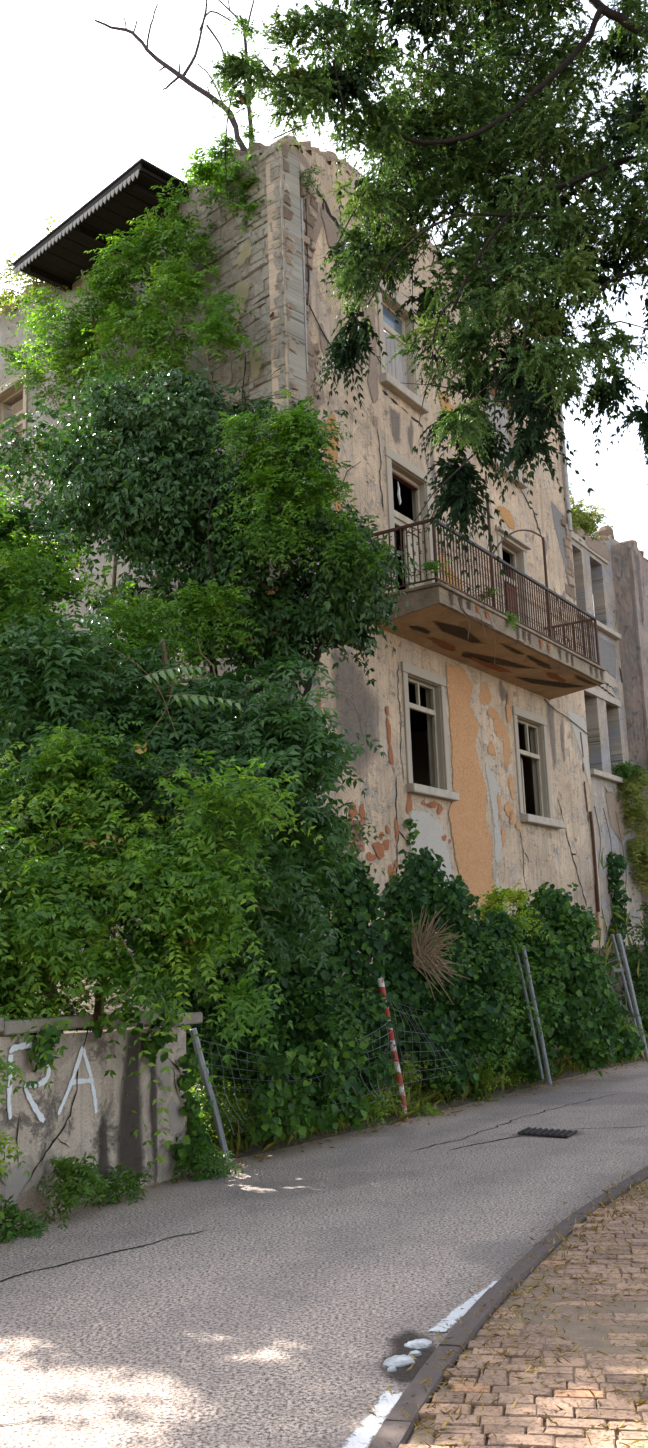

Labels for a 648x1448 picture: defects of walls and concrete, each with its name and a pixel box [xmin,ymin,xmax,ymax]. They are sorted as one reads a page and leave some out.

damp [410,622,603,699]
damp [548,705,565,765]
peeling [367,662,520,921]